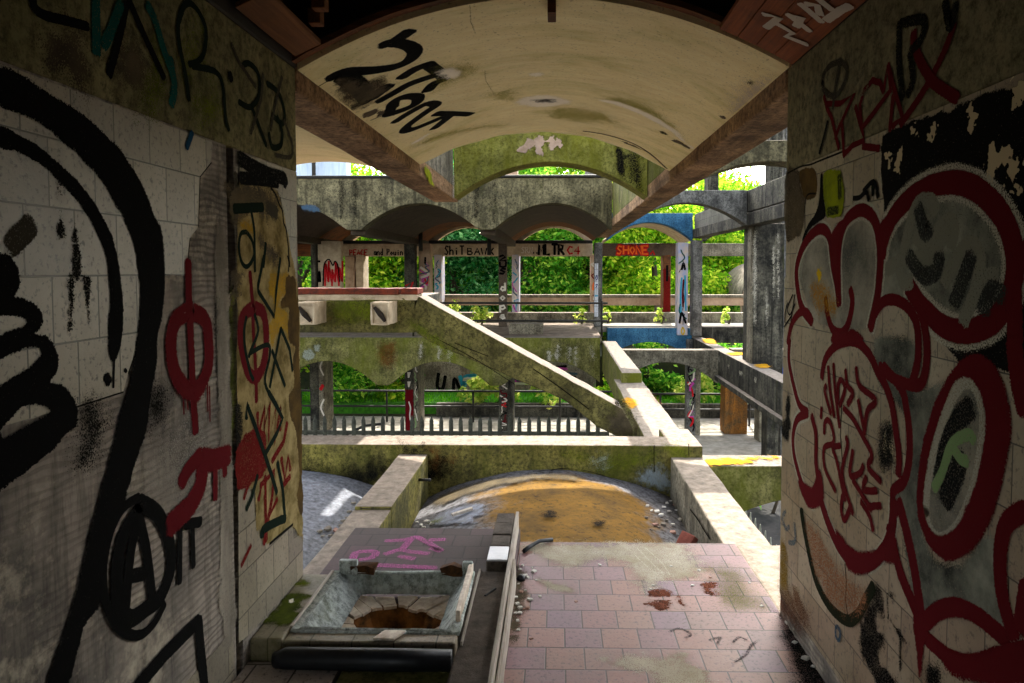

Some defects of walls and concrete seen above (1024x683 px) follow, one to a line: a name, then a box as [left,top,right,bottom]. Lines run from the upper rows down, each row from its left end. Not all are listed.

peeling [517,135,563,156]
damp [615,146,646,193]
peeling [880,76,1024,239]
peeling [930,324,1009,373]
peeling [61,378,124,478]
peeling [130,180,304,649]
damp [302,438,586,507]
damp [634,462,671,494]